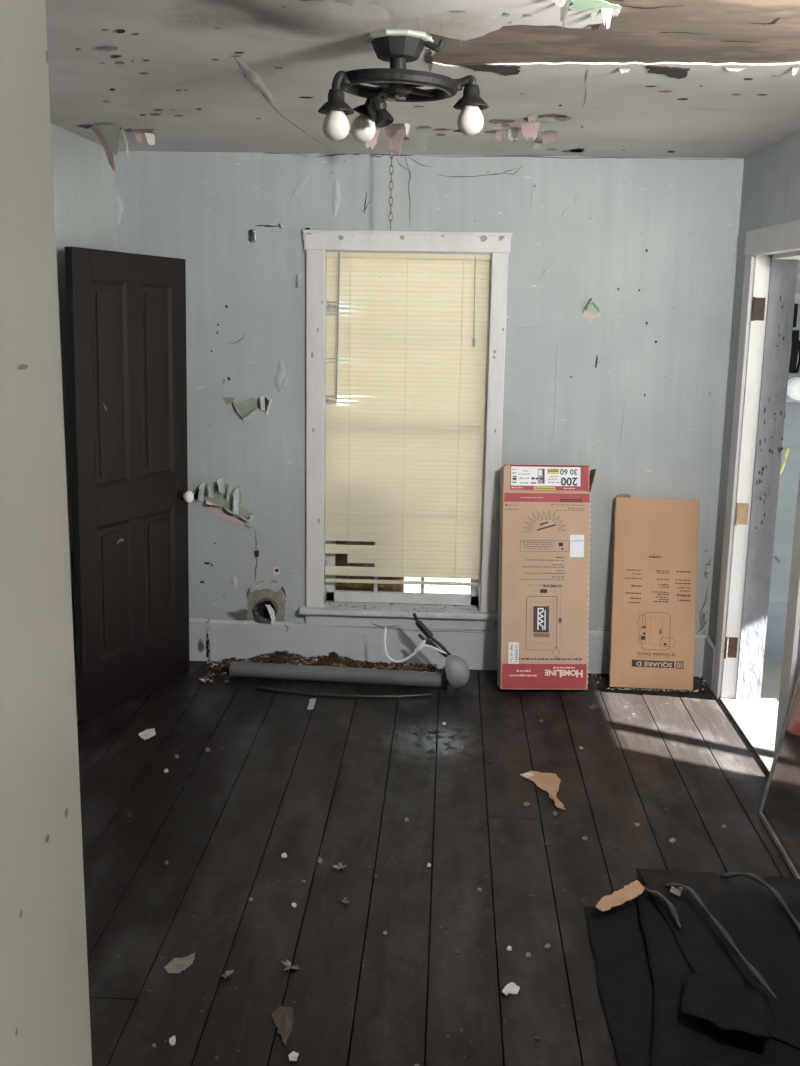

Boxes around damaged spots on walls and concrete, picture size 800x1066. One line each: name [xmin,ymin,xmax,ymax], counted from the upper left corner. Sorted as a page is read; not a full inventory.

flaking render [423,0,800,100]
peeling [77,123,155,173]
peeling [365,105,585,155]
peeling [223,396,272,422]
peeling [194,478,255,528]
crack [252,531,260,583]